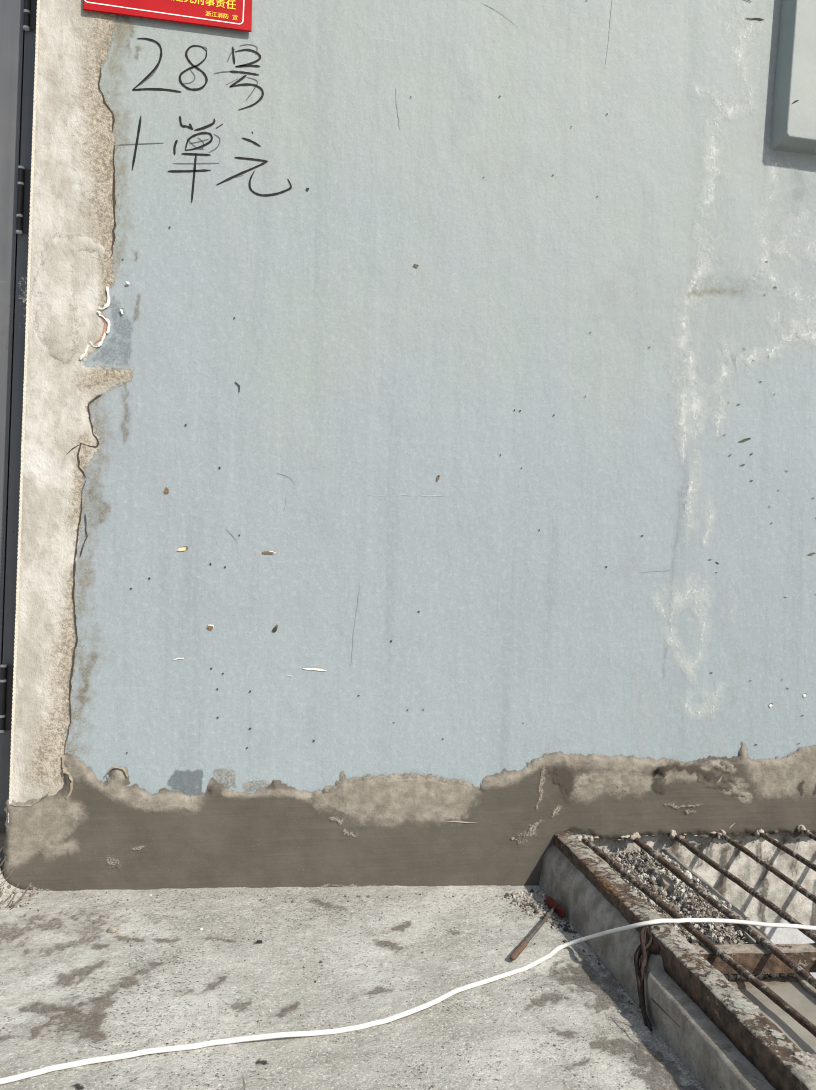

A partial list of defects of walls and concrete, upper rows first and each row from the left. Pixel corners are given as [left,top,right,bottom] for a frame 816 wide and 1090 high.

peeling [10,0,135,806]
crack [64,374,107,755]
damp [678,6,816,528]